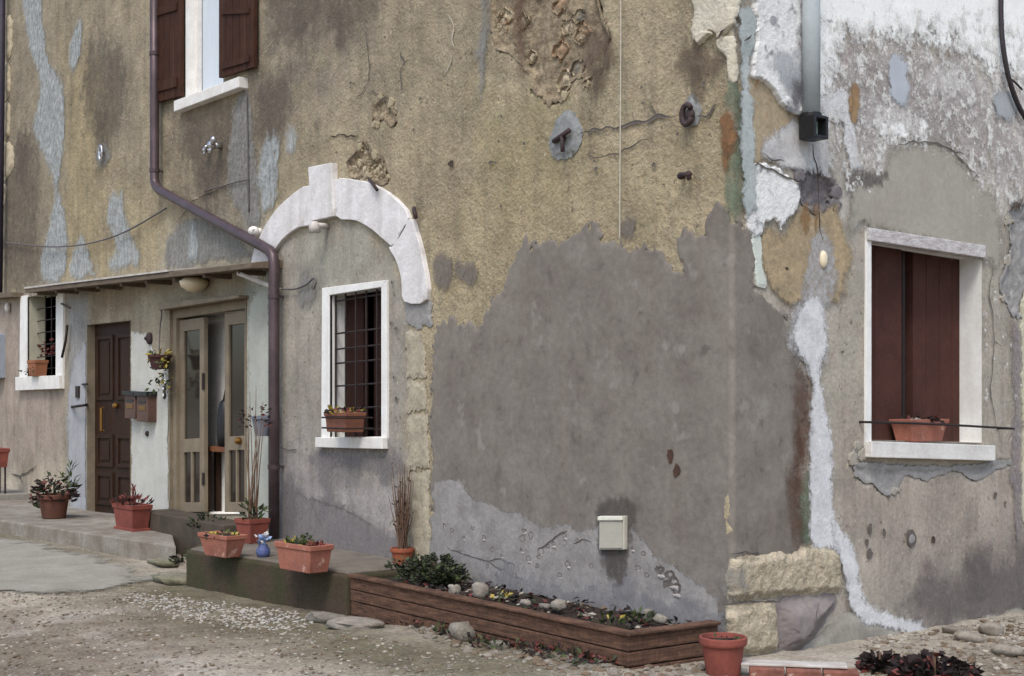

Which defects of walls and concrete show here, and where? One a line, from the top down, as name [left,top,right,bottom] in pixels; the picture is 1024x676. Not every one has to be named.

flaking render [335,138,391,186]
flaking render [371,82,398,129]
flaking render [486,0,610,107]
crack [581,103,716,158]
peeling [744,0,1024,525]
leakage [786,228,927,633]
leakage [914,324,1024,622]
peeling [429,479,723,632]